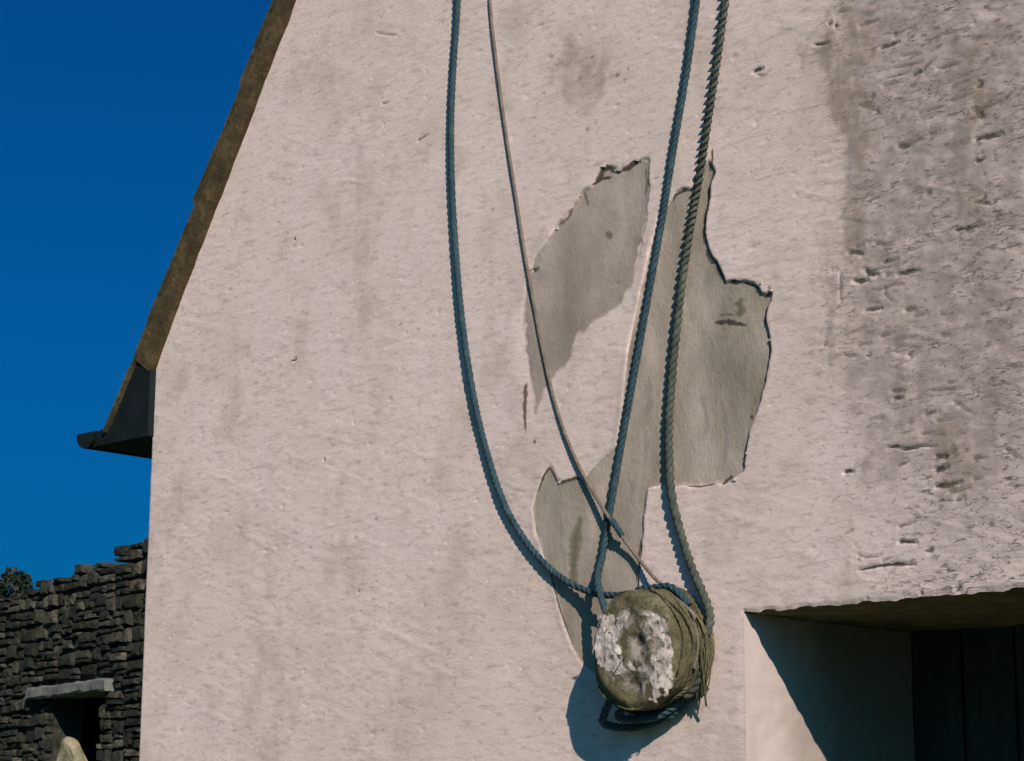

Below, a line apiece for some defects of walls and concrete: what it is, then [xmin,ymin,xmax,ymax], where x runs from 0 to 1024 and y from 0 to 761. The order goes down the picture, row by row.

spalling [526,157,773,672]